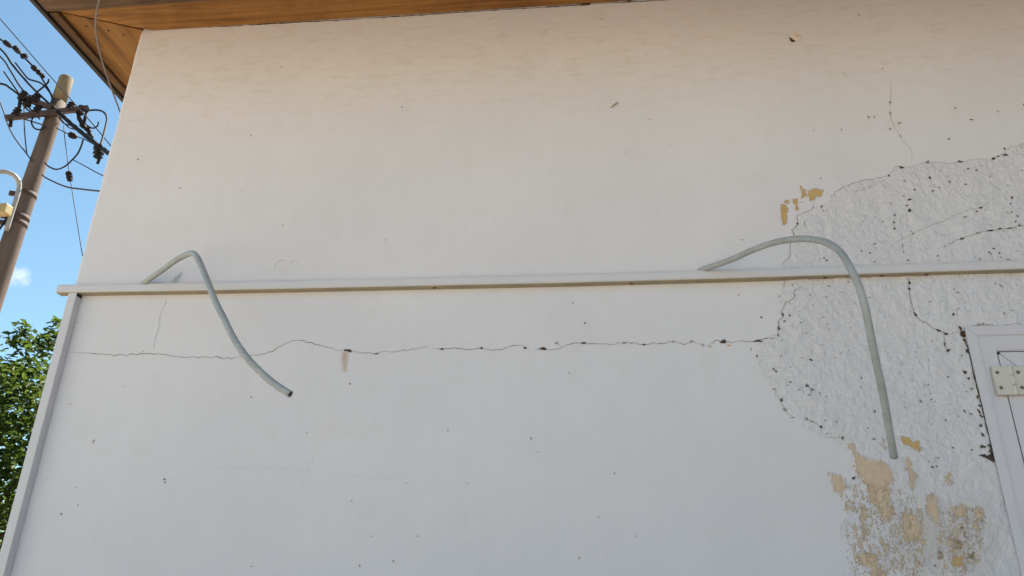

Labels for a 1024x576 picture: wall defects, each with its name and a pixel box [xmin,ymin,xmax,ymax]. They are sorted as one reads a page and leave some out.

crack [70,80,1024,359]
peeling [779,177,825,225]
crack [892,201,1024,503]
peeling [828,427,986,576]